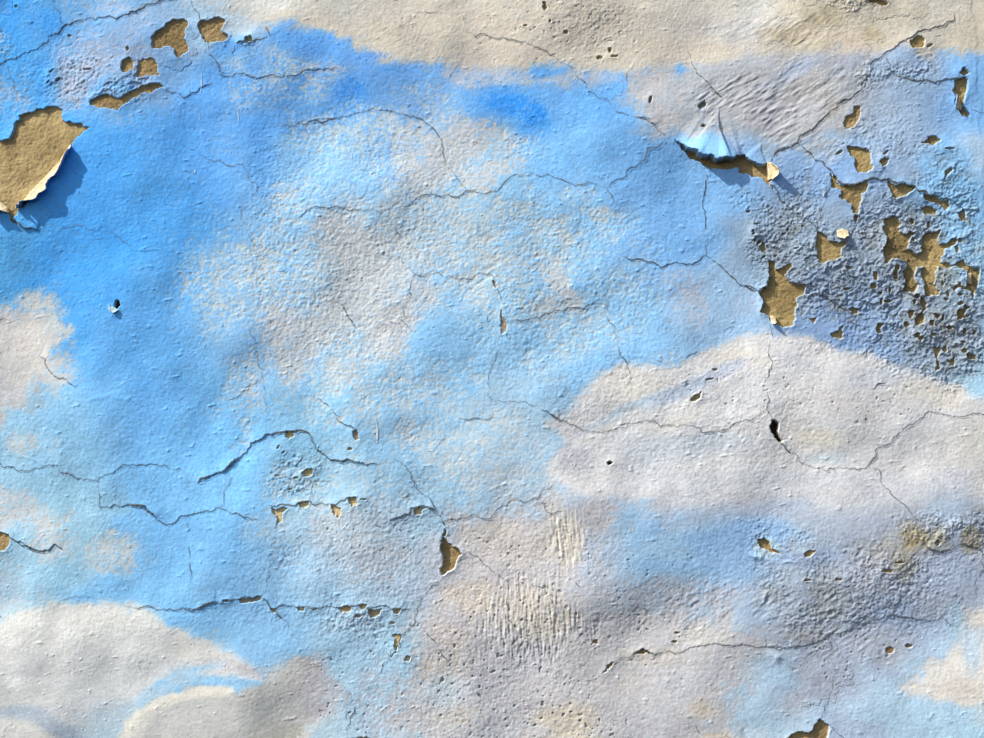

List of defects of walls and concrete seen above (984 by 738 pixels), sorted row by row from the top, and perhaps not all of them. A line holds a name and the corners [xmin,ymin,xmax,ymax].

peeling [91,17,270,111]
peeling [0,107,88,229]
peeling [681,146,779,185]
crack [622,13,967,313]
peeling [815,147,888,269]
peeling [752,231,805,327]
peeling [871,196,979,369]
crack [0,0,773,735]
peeling [441,531,461,574]
crack [780,411,984,595]
crack [614,614,980,719]
peeling [788,719,844,738]